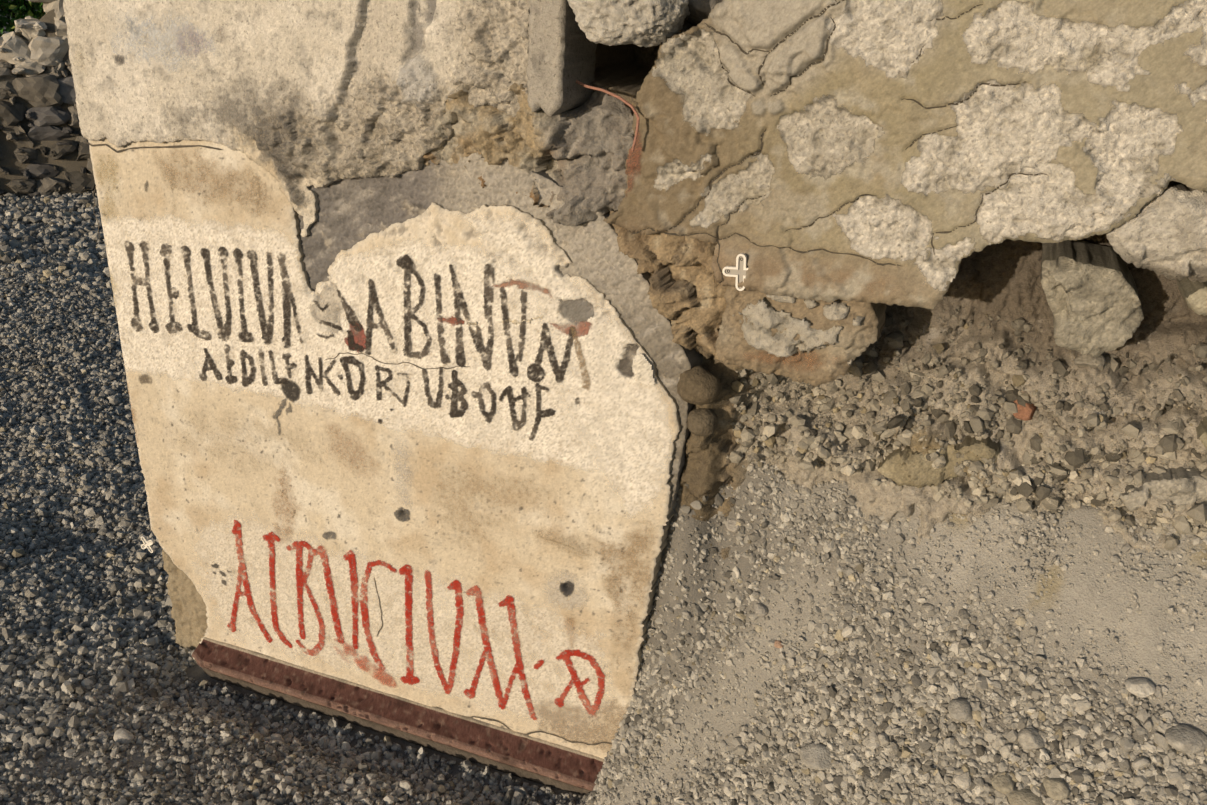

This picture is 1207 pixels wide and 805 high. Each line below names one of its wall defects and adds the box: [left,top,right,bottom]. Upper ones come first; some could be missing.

crack [705,0,844,96]
crack [911,4,983,63]
crack [83,141,222,153]
spalling [777,95,884,179]
crack [902,83,1020,150]
spalling [825,0,1207,291]
crack [626,129,901,283]
crack [931,173,1047,255]
spalling [310,282,342,333]
spalling [437,316,478,326]
spalling [493,279,594,337]
peeling [617,344,656,386]